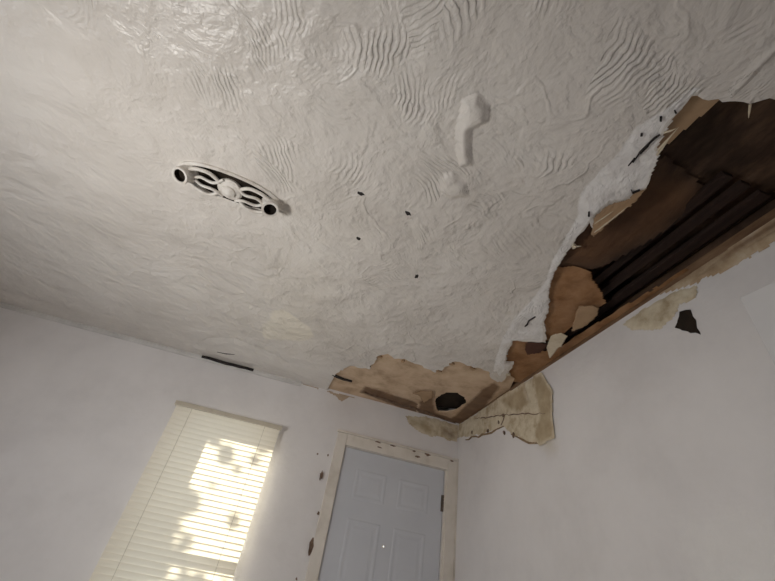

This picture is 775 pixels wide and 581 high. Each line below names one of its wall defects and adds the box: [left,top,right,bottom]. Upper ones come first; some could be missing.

flaking render [327,84,705,446]
spalling [623,231,775,335]
water stain [696,218,775,277]
peeling [189,337,317,388]